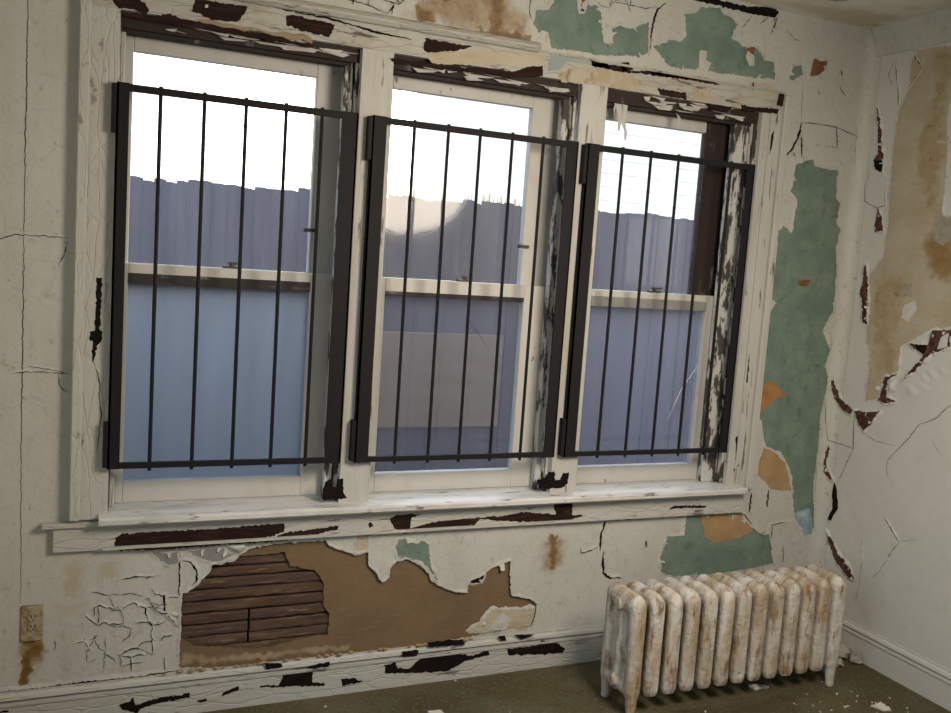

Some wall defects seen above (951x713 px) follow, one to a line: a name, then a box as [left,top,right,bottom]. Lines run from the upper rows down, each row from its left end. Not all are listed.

peeling [113,0,357,112]
crack [261,0,412,40]
water stain [384,0,537,42]
peeling [390,0,829,164]
peeling [758,42,951,582]
crack [816,405,949,479]
peeling [657,505,775,579]
crack [859,516,918,582]
crack [54,550,201,671]
spalling [114,503,585,688]
peeling [120,693,207,713]